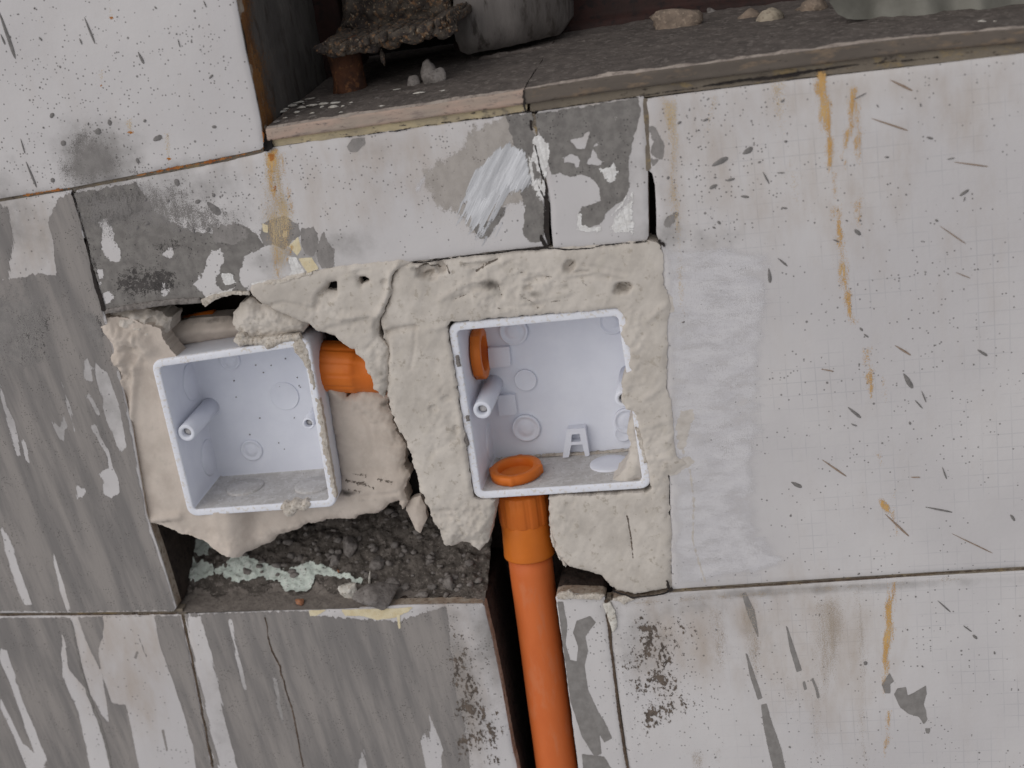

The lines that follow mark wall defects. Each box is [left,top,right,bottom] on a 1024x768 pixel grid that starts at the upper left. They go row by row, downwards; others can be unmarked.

damp [57,124,260,253]
spalling [105,230,318,314]
corrosion [135,0,294,276]
crack [345,56,938,263]
corrosion [812,71,864,323]
peeling [189,538,363,606]
crack [264,617,304,768]
damp [622,585,875,768]
corrosion [879,582,898,694]